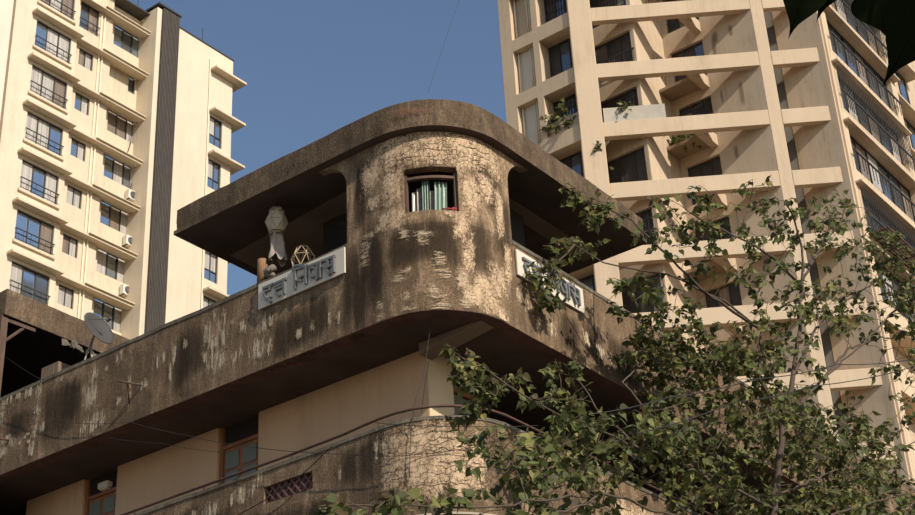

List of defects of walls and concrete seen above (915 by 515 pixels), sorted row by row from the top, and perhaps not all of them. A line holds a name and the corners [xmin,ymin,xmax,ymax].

damp [355,165,369,225]
crack [338,141,494,284]
damp [471,162,510,270]
damp [346,220,458,323]
peeling [156,339,188,381]
peeling [202,296,275,377]
damp [45,381,80,433]
damp [344,434,383,481]
crack [370,420,519,498]